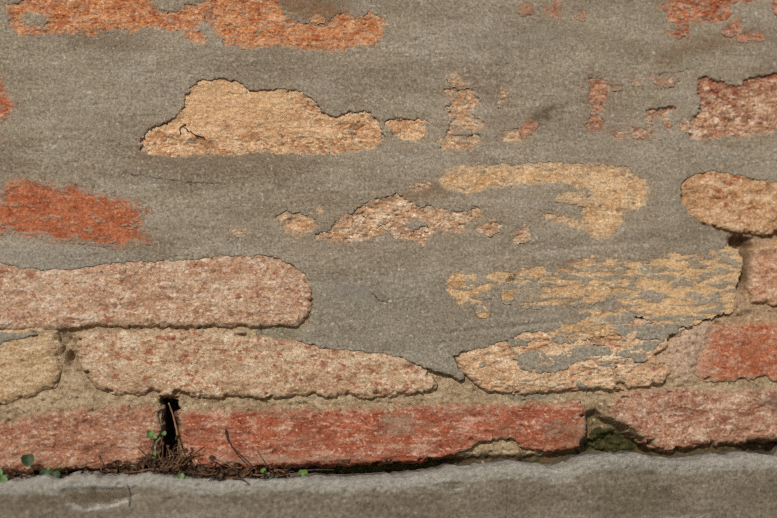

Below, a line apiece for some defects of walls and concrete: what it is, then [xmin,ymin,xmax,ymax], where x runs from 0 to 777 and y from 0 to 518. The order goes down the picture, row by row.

peeling [5,0,385,55]
peeling [656,0,765,43]
peeling [0,75,18,124]
peeling [140,79,428,158]
peeling [436,71,488,152]
peeling [502,119,539,144]
peeling [585,73,777,140]
peeling [0,177,154,250]
peeling [275,193,502,245]
peeling [512,224,532,246]
peeling [409,161,651,241]
peeling [446,270,515,318]